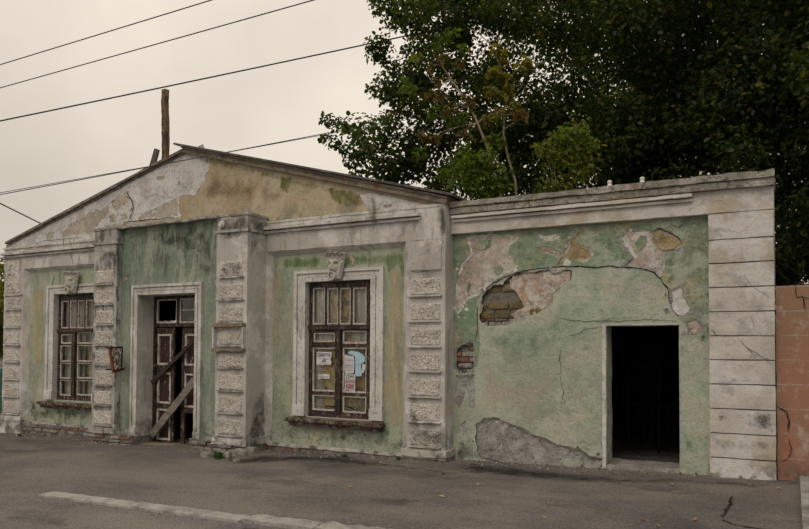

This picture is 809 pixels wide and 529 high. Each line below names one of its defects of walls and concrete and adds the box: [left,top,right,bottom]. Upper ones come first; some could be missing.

peeling [8,144,210,247]
spalling [453,229,594,326]
spalling [617,224,686,277]
spalling [455,341,475,408]
spalling [460,418,602,468]
crack [778,407,792,458]